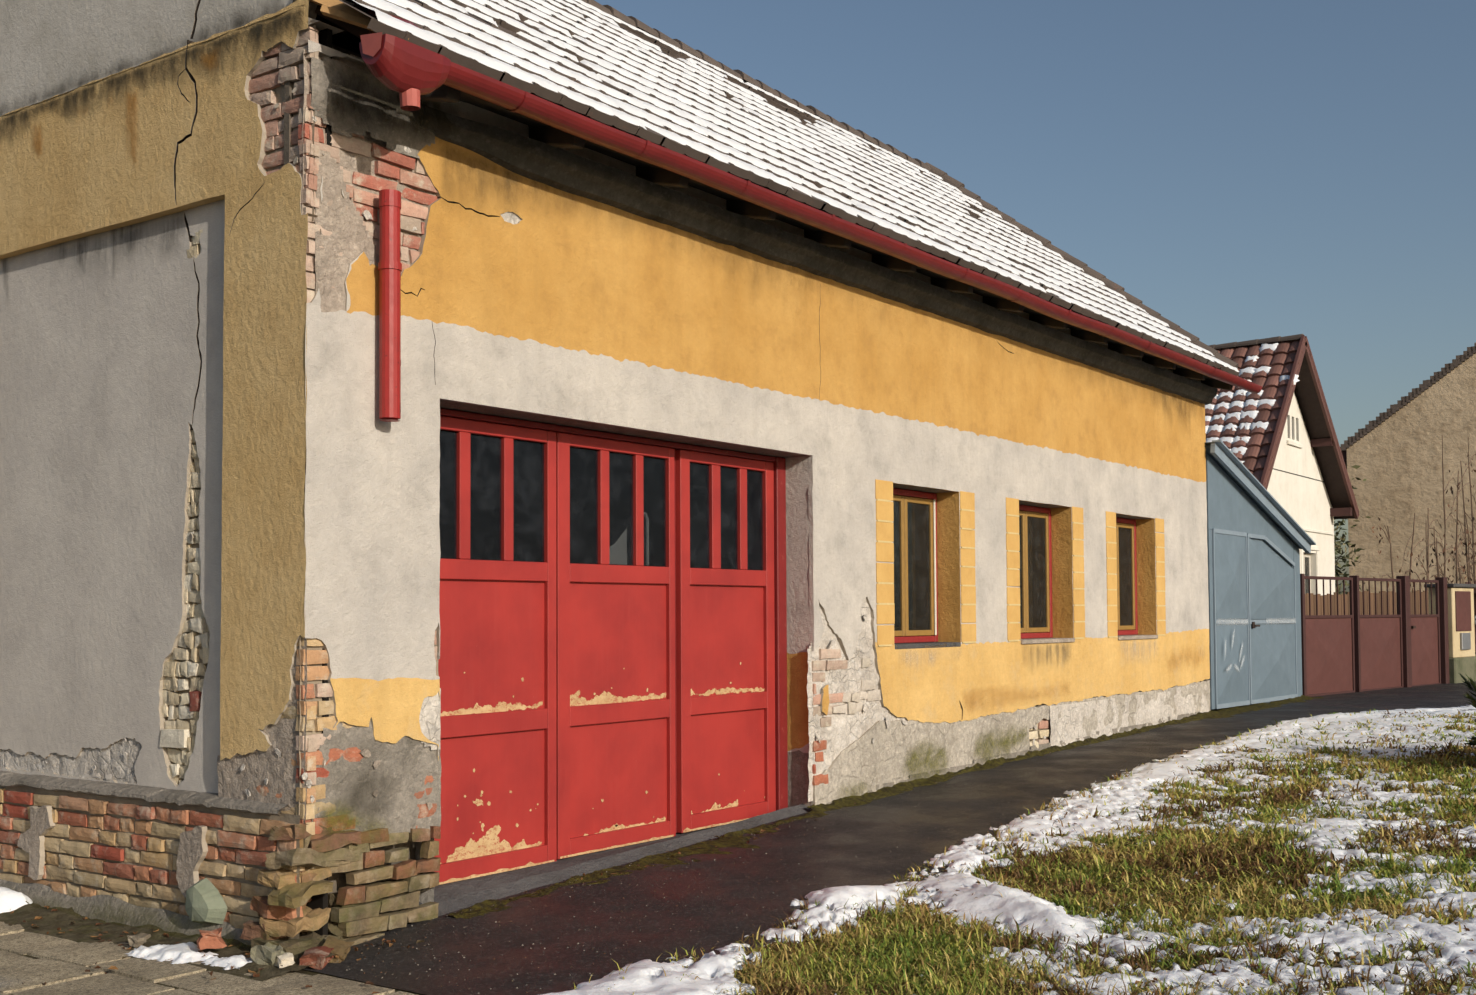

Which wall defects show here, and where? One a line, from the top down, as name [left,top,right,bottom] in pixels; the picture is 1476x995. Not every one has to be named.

damp [0,10,301,130]
crack [174,0,202,430]
spalling [248,25,438,312]
peeling [0,738,142,783]
spalling [160,430,210,784]
peeling [217,630,764,885]
spalling [807,598,908,802]